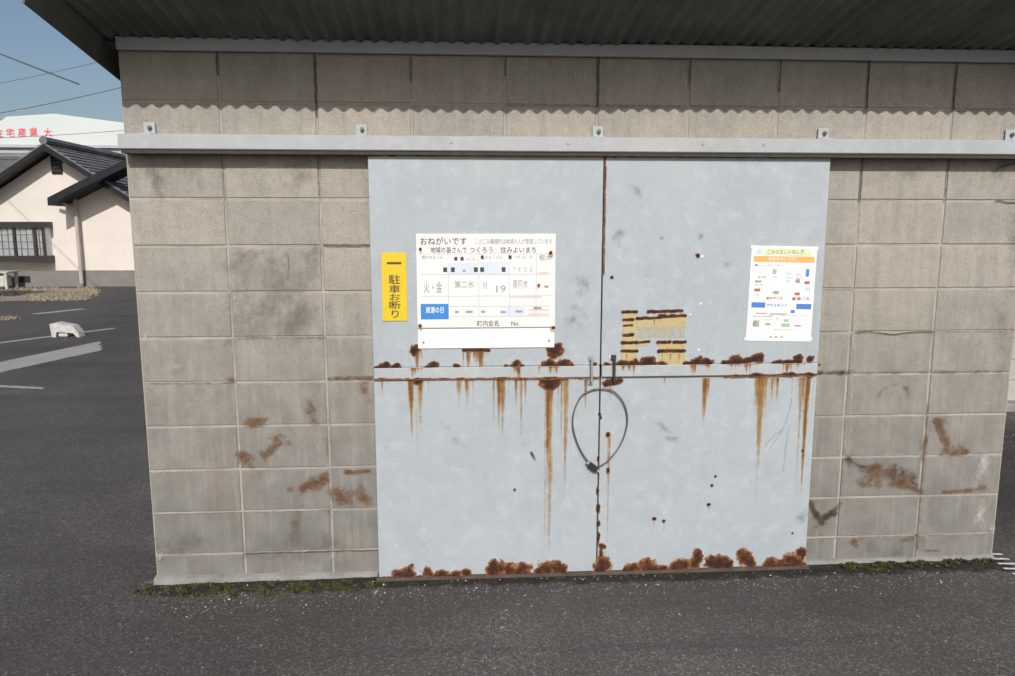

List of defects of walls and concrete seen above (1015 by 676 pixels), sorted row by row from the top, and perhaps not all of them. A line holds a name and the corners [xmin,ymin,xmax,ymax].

rust [245,418,267,427]
rust [236,434,290,466]
rust [329,343,668,511]
rust [923,408,970,460]
rust [288,472,371,505]
rust [846,456,924,494]
rust [382,563,472,578]
rust [485,558,568,575]